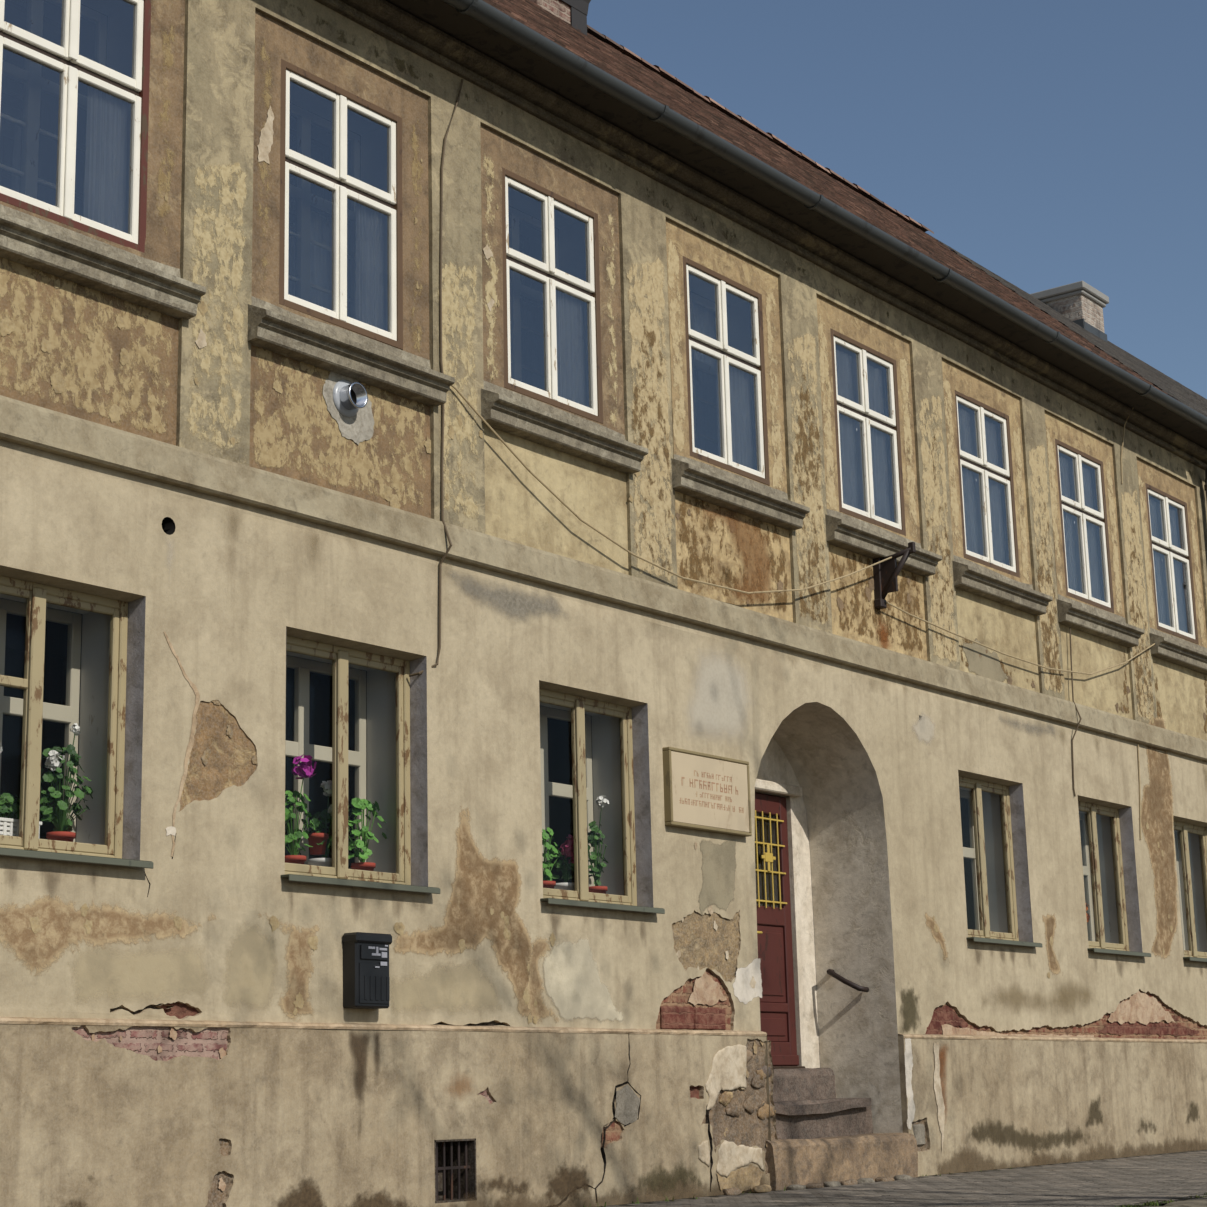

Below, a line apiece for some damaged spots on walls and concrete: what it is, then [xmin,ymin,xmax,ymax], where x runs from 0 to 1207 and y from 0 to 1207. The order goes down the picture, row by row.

peeling [0,258,172,434]
peeling [187,40,500,517]
peeling [603,215,988,667]
flaking render [179,700,258,812]
flaking render [72,1001,231,1061]
flaking render [394,808,560,1024]
leakage [467,1166,724,1207]
crack [557,1034,641,1207]
flaking render [656,906,741,1030]
flaking render [690,1038,778,1193]
flaking render [925,989,1207,1040]
leakage [933,1042,1207,1174]